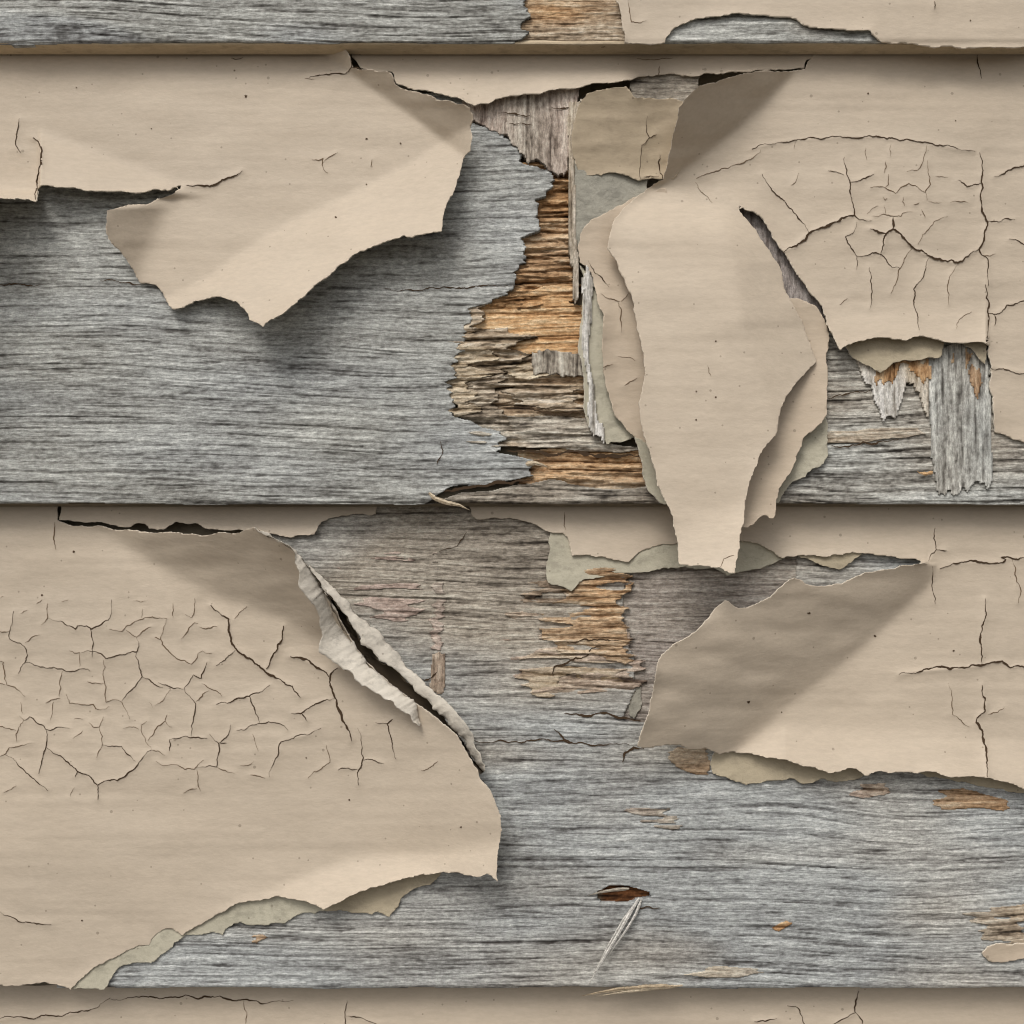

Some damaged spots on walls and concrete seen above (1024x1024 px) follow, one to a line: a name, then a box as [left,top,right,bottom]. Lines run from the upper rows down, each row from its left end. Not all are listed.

peeling [616,0,1024,49]
crack [15,122,43,200]
crack [696,135,1024,341]
peeling [0,50,1024,722]
crack [0,596,396,796]
peeling [0,506,1024,1024]
crack [900,599,1024,777]